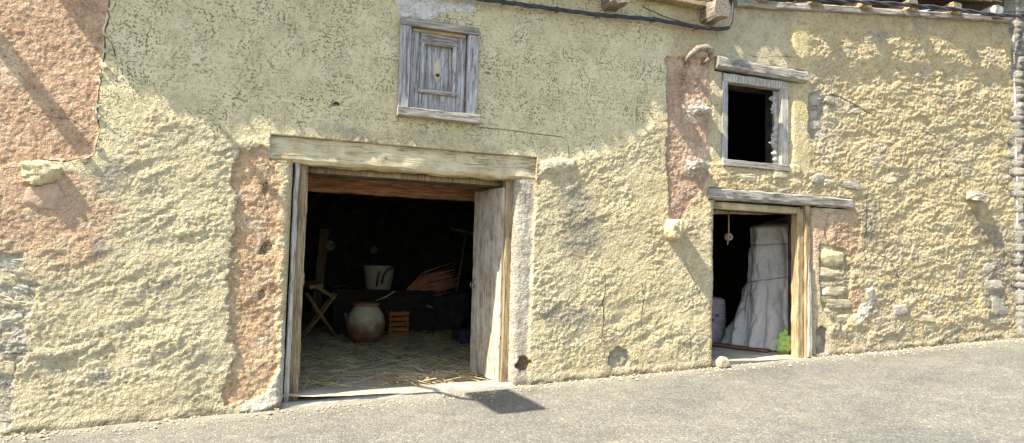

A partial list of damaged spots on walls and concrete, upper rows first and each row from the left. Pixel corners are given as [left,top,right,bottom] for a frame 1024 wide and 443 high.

flaking render [0,0,112,168]
flaking render [665,55,709,220]
flaking render [221,145,282,406]
flaking render [514,355,532,373]
crack [593,273,610,366]
flaking render [608,346,631,371]
flaking render [815,208,864,355]